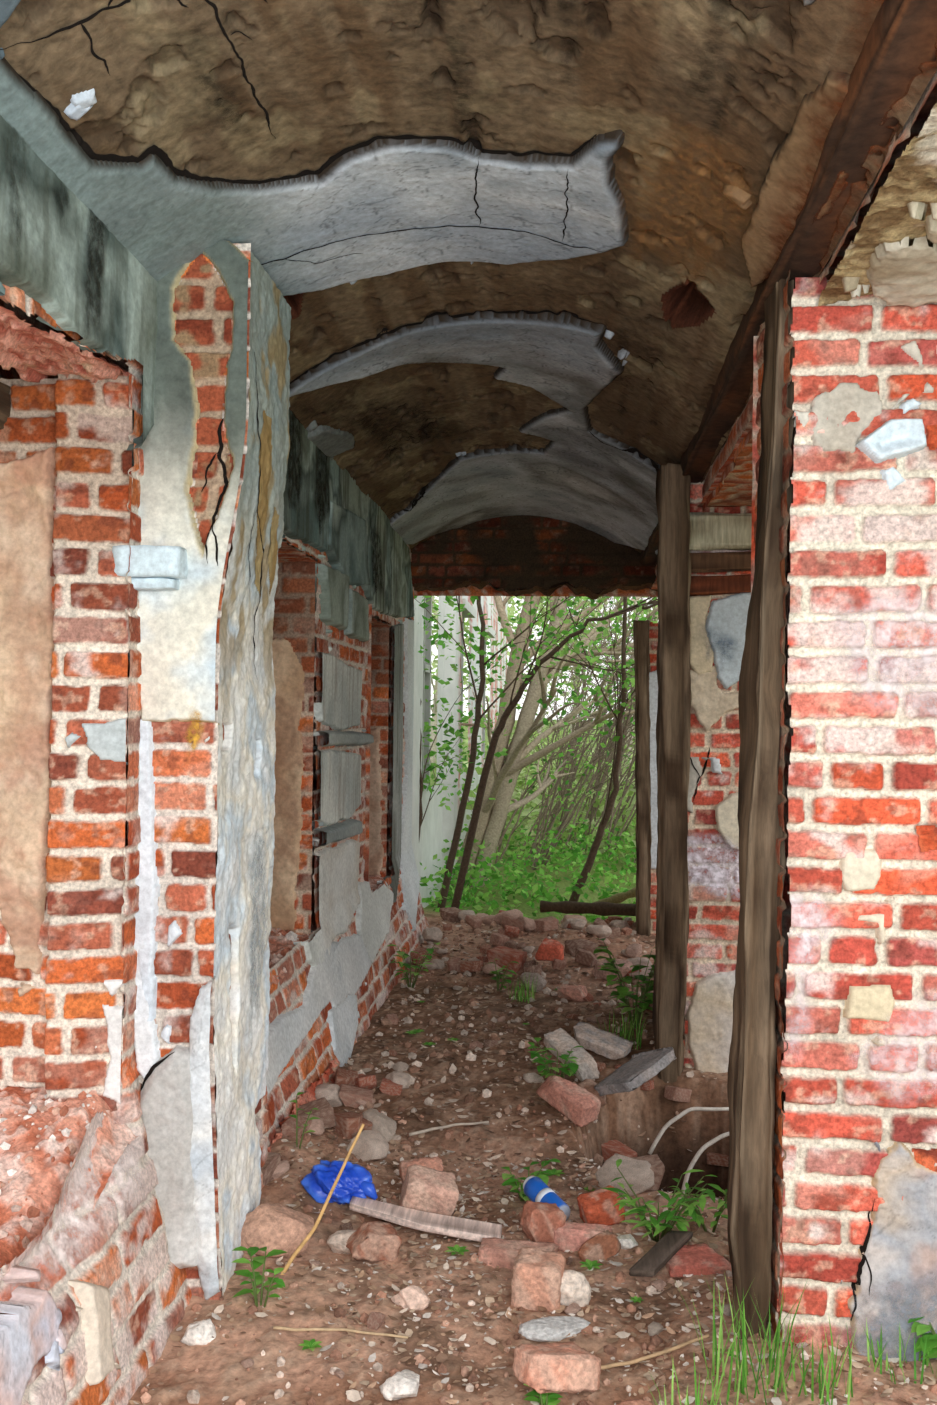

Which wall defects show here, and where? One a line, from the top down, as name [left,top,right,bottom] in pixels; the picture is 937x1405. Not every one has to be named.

crack [0,0,628,265]
leakage [85,210,106,325]
peeling [842,201,937,308]
crack [290,310,606,384]
peeling [856,341,937,490]
crack [202,352,264,677]
crack [390,485,428,515]
peeling [0,48,661,1300]
peeling [690,592,751,689]
crack [851,1200,875,1320]
peeling [840,1142,937,1361]
peeling [0,1263,121,1405]